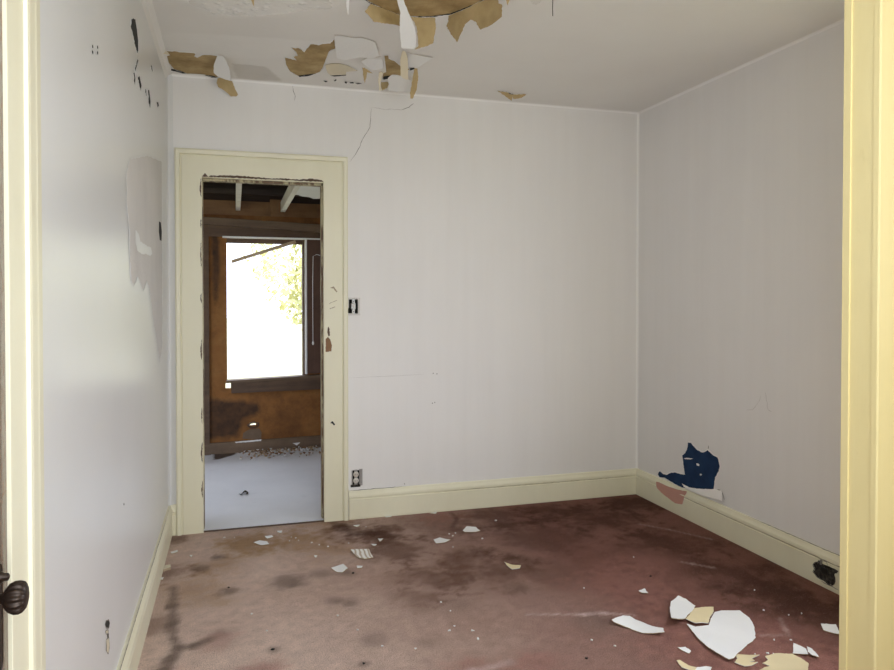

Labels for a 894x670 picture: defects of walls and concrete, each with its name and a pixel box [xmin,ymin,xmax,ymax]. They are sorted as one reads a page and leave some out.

peeling [163,50,238,97]
peeling [283,0,509,99]
peeling [496,90,528,101]
peeling [656,441,725,504]